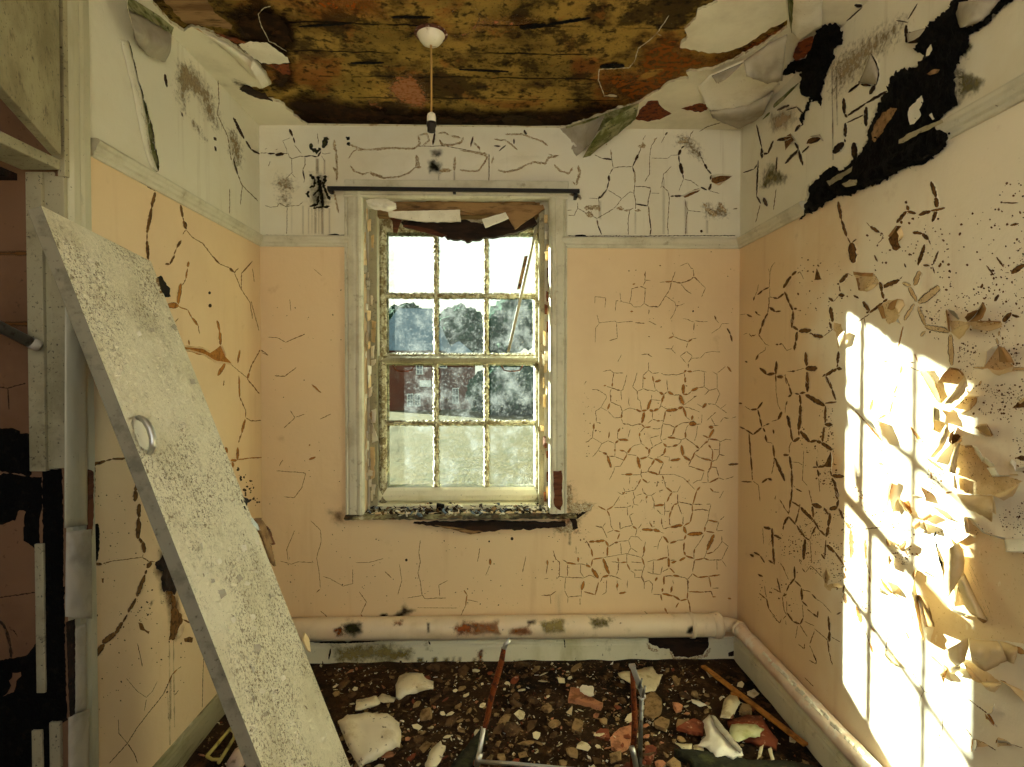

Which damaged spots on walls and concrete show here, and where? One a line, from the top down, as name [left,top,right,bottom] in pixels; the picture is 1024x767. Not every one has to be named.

water stain [226,5,617,126]
flaking render [153,0,787,126]
crack [846,3,863,22]
crack [896,4,918,43]
peeling [907,28,925,43]
crack [419,130,527,180]
peeling [784,133,824,150]
crack [95,457,125,467]
crack [522,181,1024,752]
peeling [758,182,1024,767]
crack [281,521,477,617]
crack [96,483,204,763]